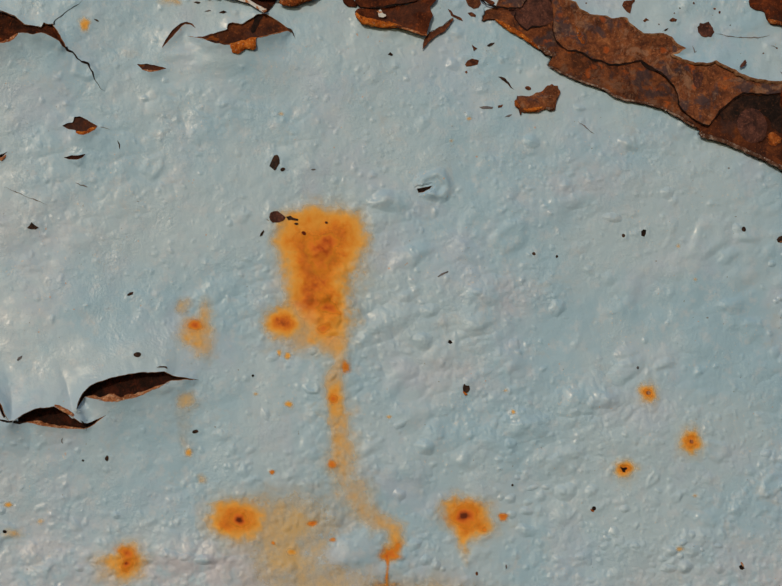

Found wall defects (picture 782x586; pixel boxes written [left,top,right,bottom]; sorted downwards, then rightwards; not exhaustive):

peeling [622,0,635,13]
peeling [0,6,71,54]
peeling [697,22,714,37]
corrosion [182,309,211,351]
corrosion [264,205,404,586]
corrosion [638,386,656,402]
corrosion [680,430,702,455]
corrosion [615,461,634,477]
corrosion [206,499,267,543]
corrosion [442,496,508,553]
corrosion [100,542,146,581]